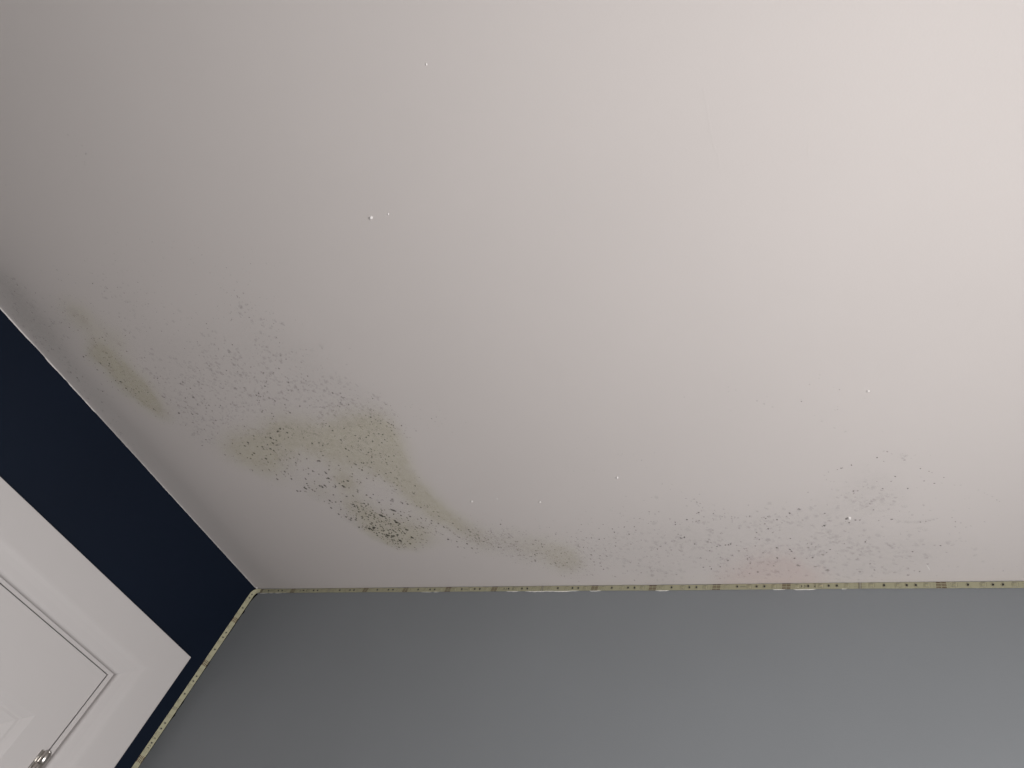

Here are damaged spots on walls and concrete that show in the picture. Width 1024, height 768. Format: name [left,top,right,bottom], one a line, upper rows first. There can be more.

damp [277,454,439,548]